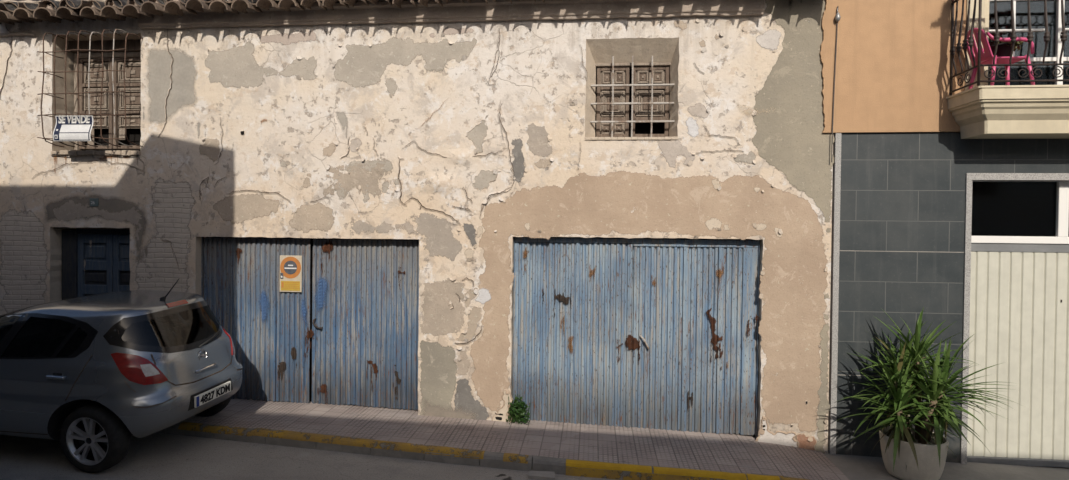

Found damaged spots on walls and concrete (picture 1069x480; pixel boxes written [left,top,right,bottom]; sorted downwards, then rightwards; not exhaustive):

crack [0,23,12,94]
crack [157,29,182,138]
peeling [205,31,318,88]
crack [32,155,145,180]
peeling [199,138,221,161]
peeling [289,139,399,233]
crack [334,28,515,226]
flaking render [135,178,194,292]
flaking render [332,0,835,453]
corrosion [542,290,573,353]
corrosion [616,334,642,364]
corrosion [706,308,729,380]